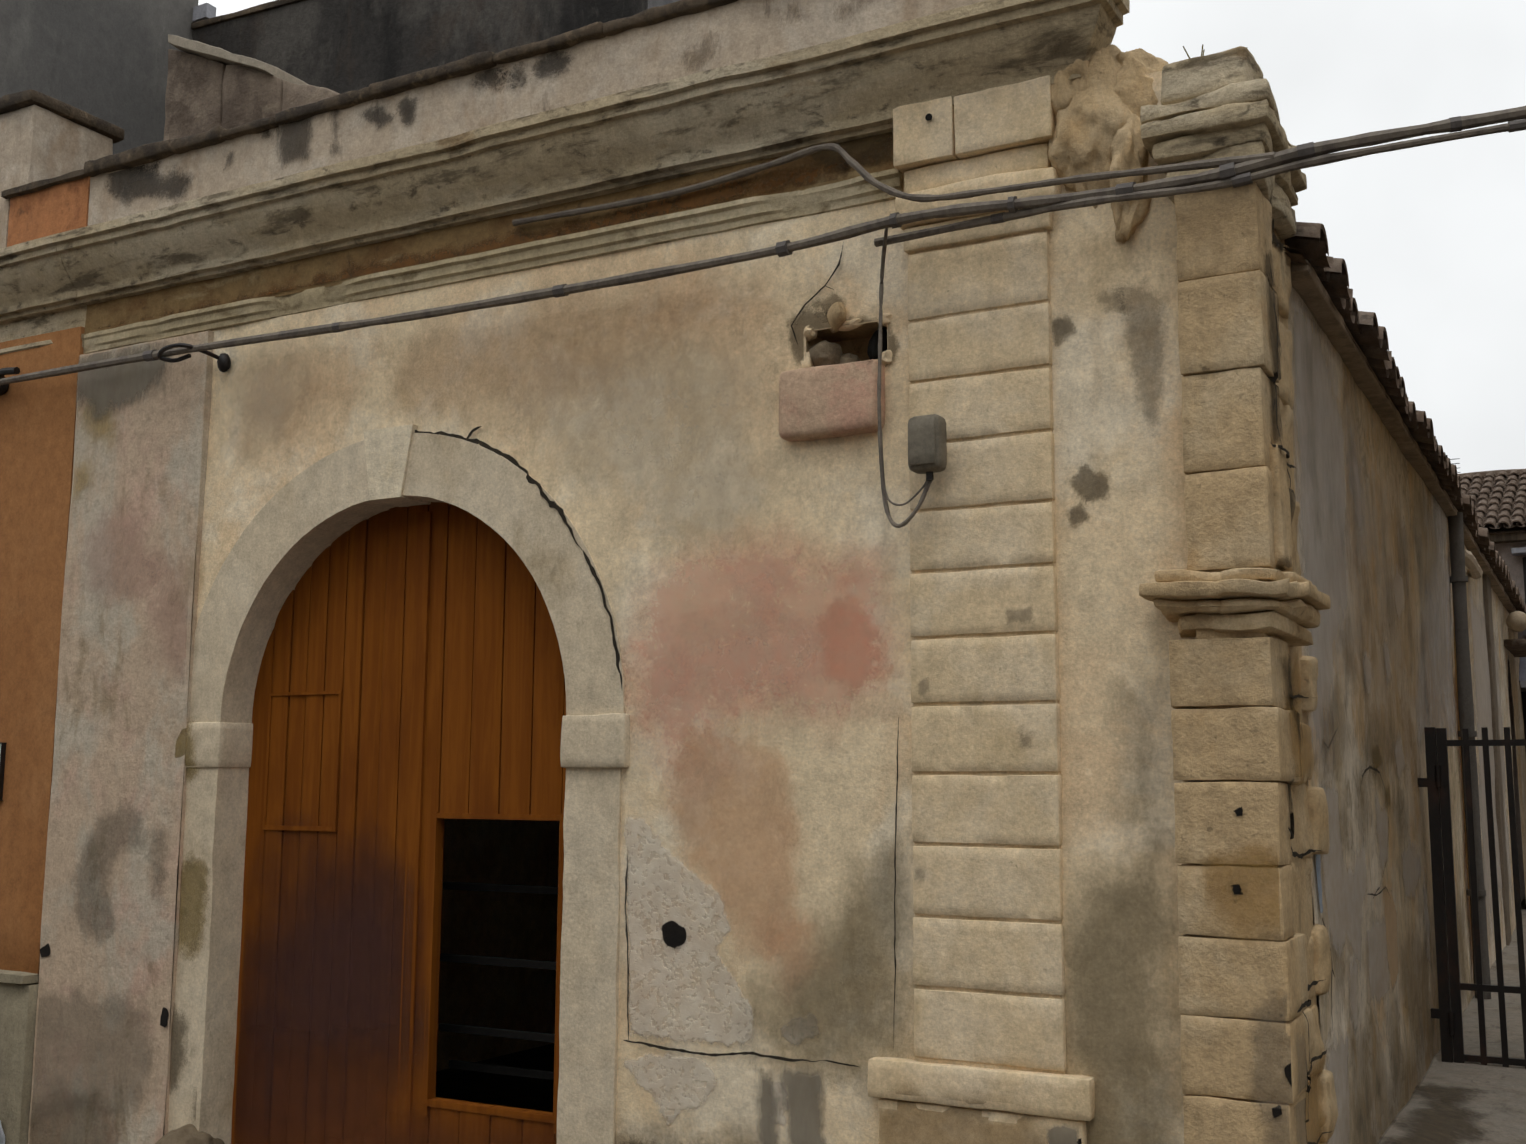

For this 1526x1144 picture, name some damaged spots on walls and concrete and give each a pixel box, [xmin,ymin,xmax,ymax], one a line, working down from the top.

damp [108,164,190,205]
spalling [1048,44,1169,244]
peeling [800,302,894,368]
crack [415,426,622,688]
flaking render [625,817,753,1046]
crack [1288,789,1321,859]
crack [1297,918,1335,1144]
crack [1360,766,1391,898]